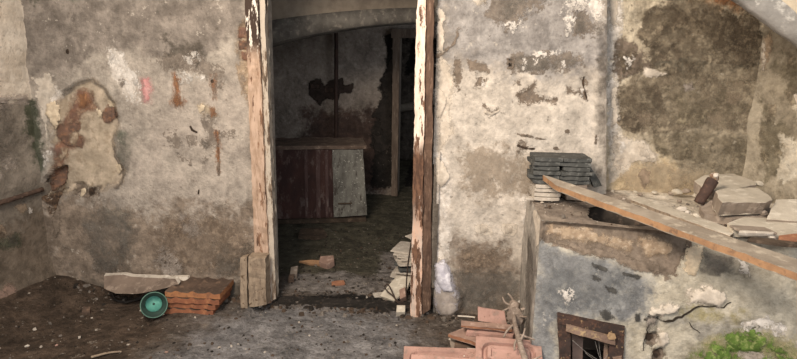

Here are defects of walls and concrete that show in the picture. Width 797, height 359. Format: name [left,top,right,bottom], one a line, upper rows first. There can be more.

corrosion [171,73,183,108]
flaking render [308,78,354,106]
peeling [506,50,588,106]
water stain [614,0,763,193]
spalling [0,72,126,238]
spalling [522,200,750,281]
crack [643,302,731,351]